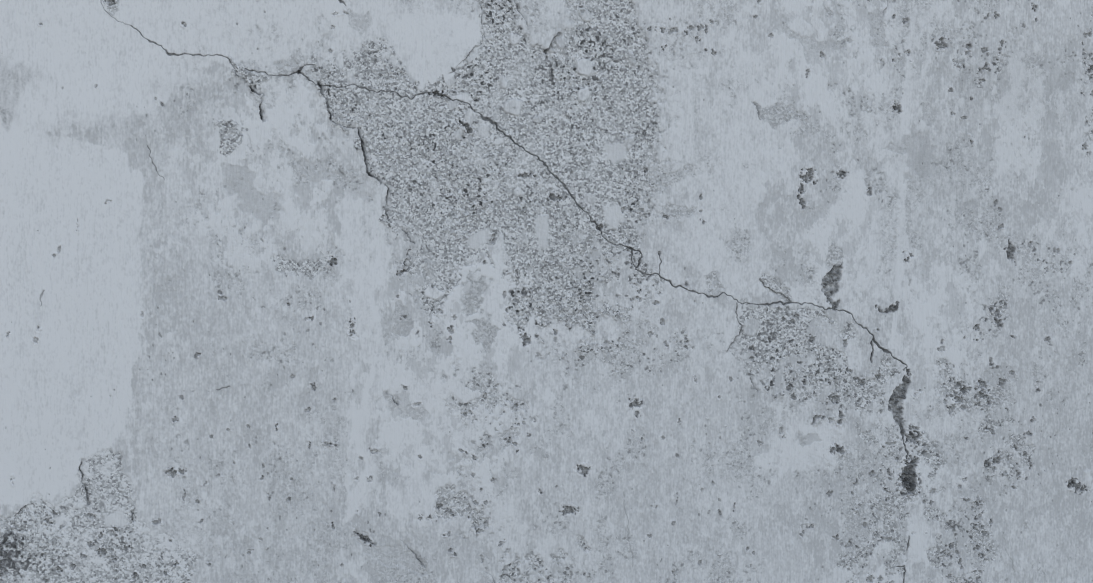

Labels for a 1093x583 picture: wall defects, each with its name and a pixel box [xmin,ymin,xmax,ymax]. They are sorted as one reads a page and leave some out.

crack [101,0,909,377]
spalling [310,0,717,388]
peeling [826,242,844,268]
spalling [0,449,211,583]
spalling [722,273,1042,583]